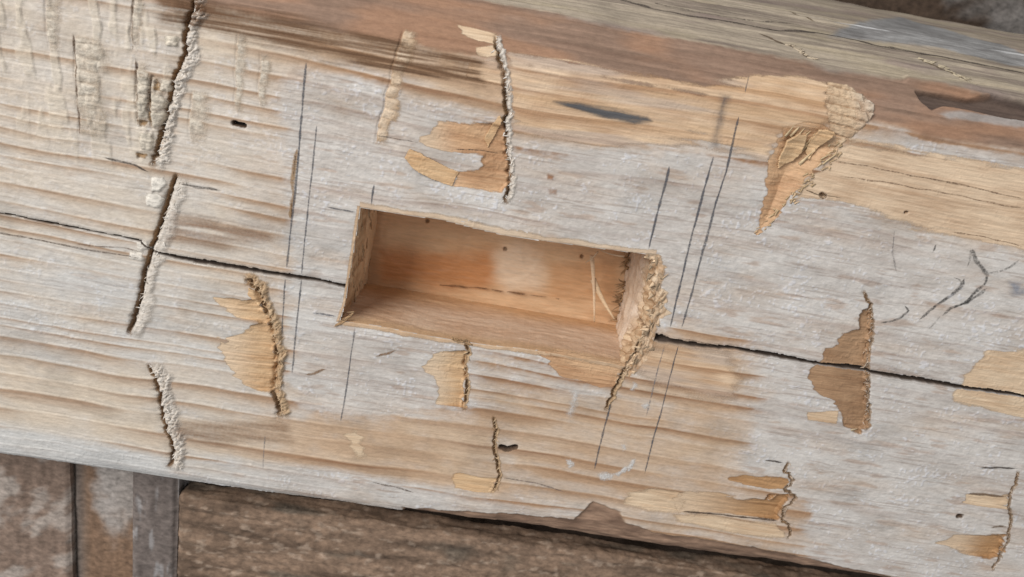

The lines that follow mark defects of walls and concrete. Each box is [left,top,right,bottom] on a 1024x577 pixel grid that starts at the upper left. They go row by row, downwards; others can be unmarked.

peeling [405,149,459,186]
crack [0,211,346,290]
crack [654,332,1024,397]
peeling [953,349,1024,418]
spalling [623,488,684,513]